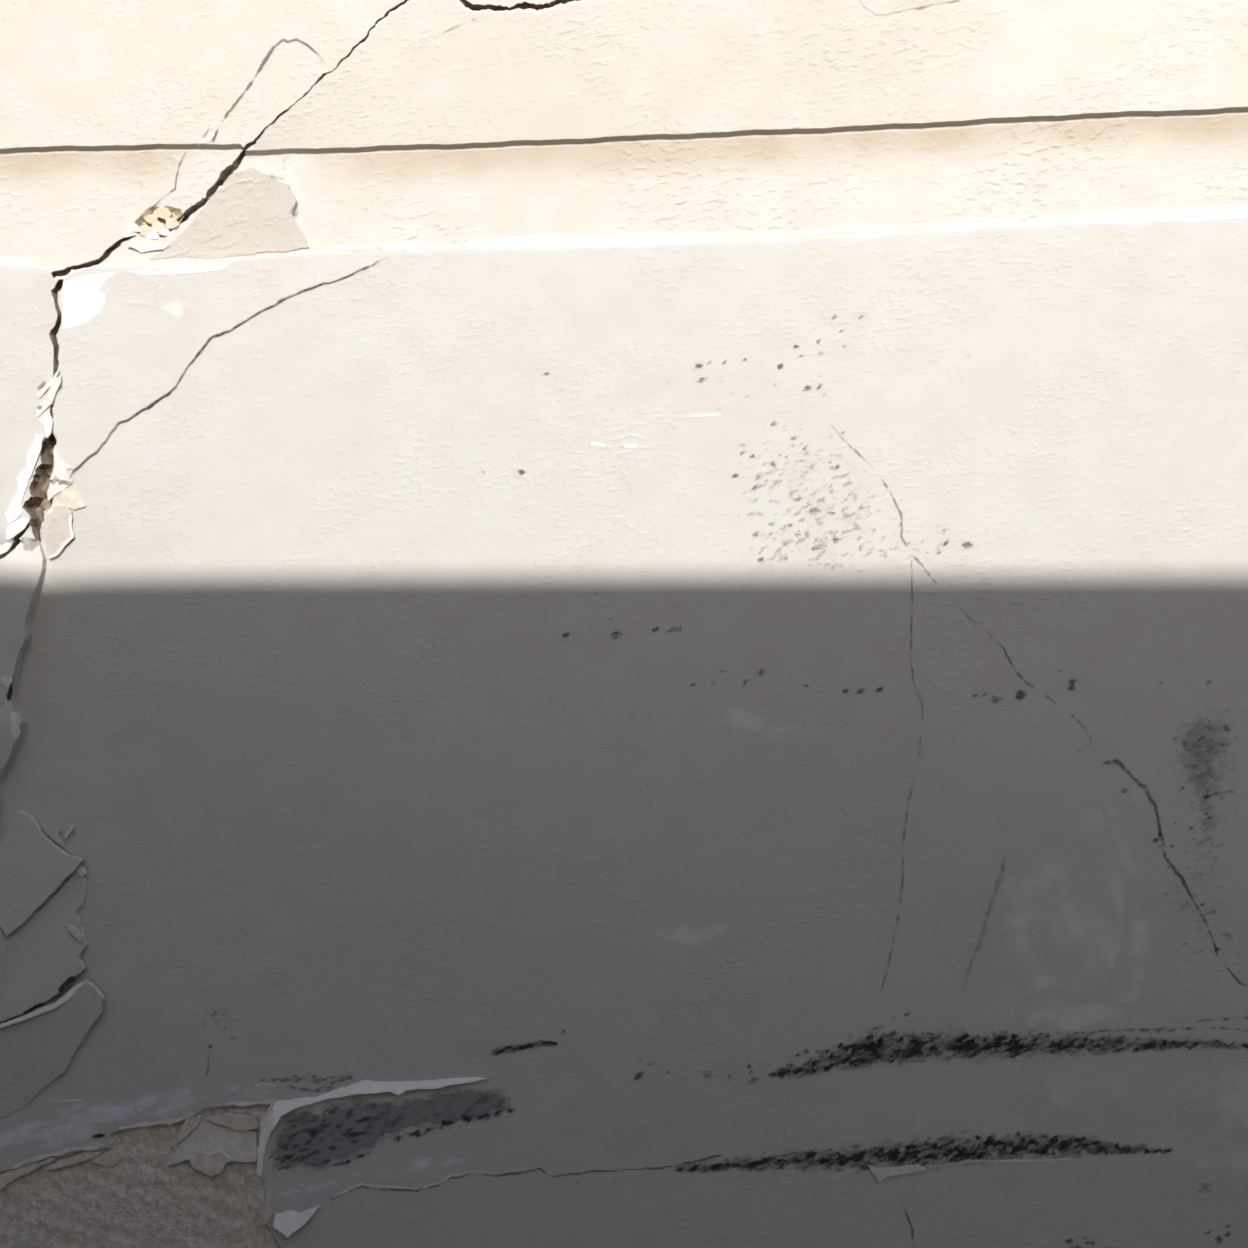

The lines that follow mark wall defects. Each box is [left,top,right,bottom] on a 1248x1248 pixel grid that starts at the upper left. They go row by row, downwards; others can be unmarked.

crack [457,0,589,14]
flaking render [127,205,183,253]
peeling [61,272,116,328]
crack [0,0,412,559]
peeling [0,371,104,1118]
crack [1107,760,1245,985]
water stain [767,1017,1248,1077]
flaking render [0,1077,513,1248]
water stain [678,1132,1171,1172]